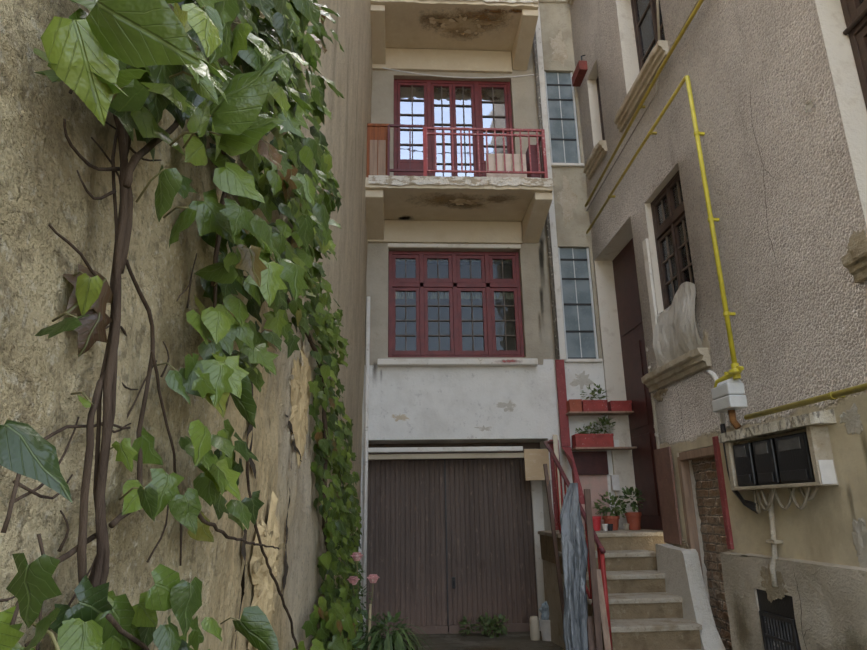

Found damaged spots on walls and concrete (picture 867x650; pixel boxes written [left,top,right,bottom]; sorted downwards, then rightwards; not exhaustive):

flaking render [288,341,311,468]
flaking render [250,490,285,623]